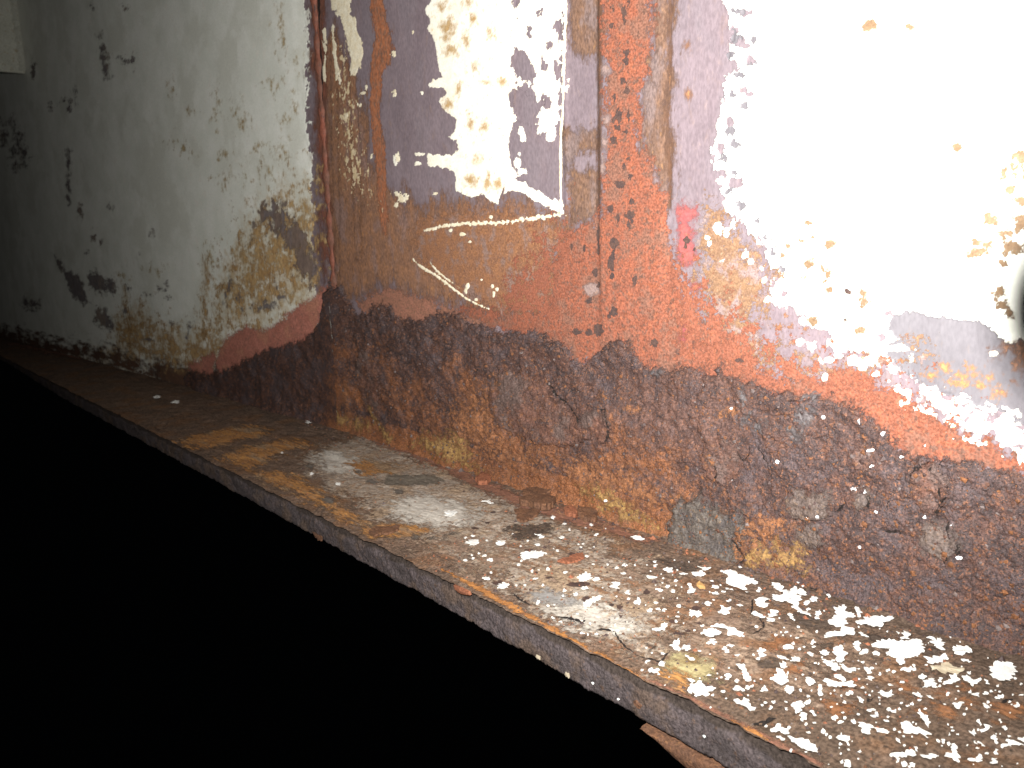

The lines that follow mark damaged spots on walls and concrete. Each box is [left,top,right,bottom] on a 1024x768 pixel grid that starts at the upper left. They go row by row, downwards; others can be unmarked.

rust [0,0,604,387]
peeling [250,0,1024,478]
rust [636,0,692,213]
rust [171,189,1024,768]